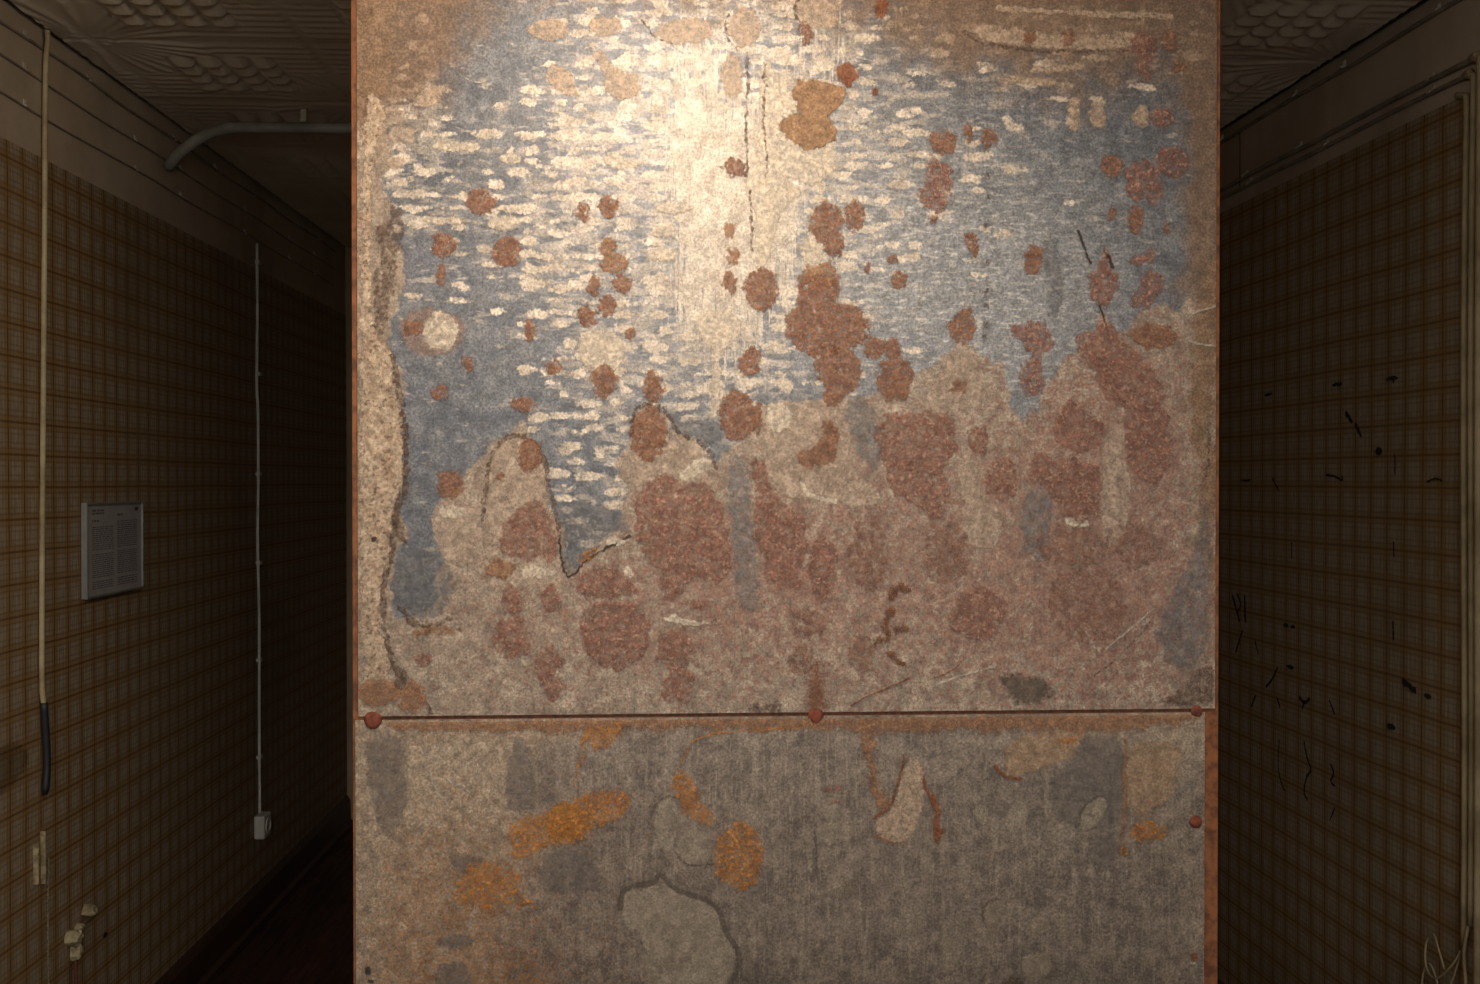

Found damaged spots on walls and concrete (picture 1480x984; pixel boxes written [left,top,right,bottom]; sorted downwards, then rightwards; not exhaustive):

corrosion [575,195,619,222]
corrosion [577,237,633,327]
peeling [358,85,464,714]
peeling [431,433,565,602]
corrosion [589,364,619,399]
peeling [629,402,719,520]
corrosion [719,199,1018,640]
corrosion [358,458,1214,917]
damp [654,797,711,865]
peeling [873,754,925,844]
damp [1003,729,1182,842]
damp [622,879,736,984]